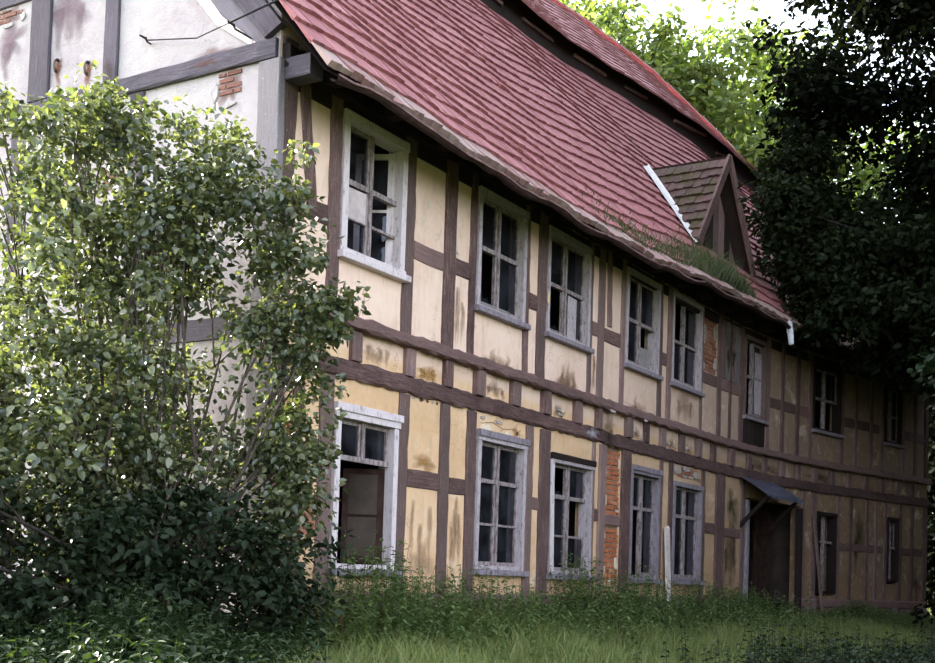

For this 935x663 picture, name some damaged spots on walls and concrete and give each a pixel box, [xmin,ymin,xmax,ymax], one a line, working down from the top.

flaking render [0,9,26,29]
flaking render [211,69,242,109]
flaking render [703,318,717,375]
flaking render [603,447,620,583]